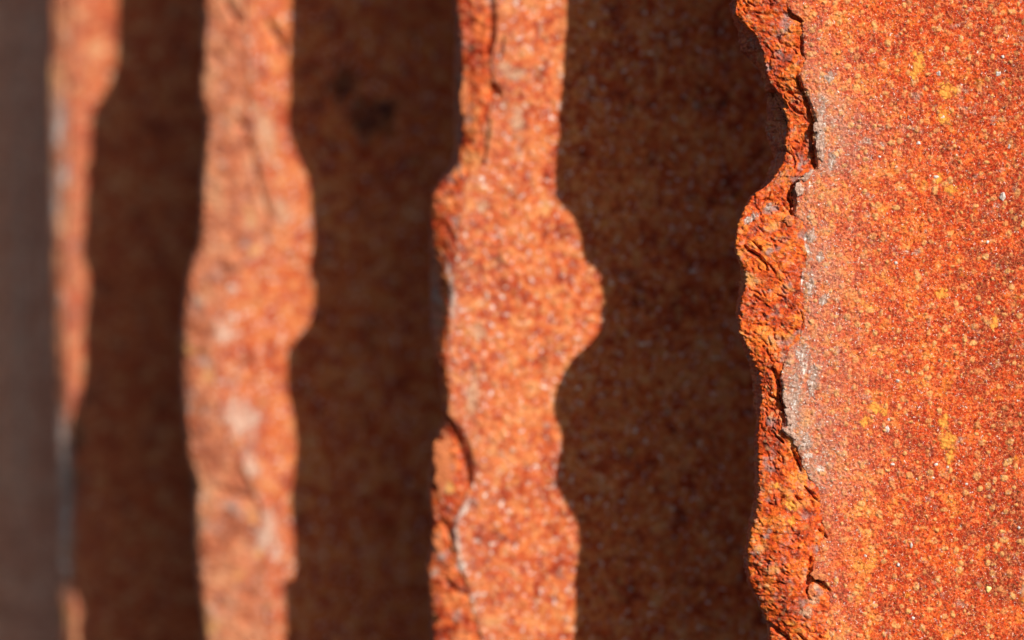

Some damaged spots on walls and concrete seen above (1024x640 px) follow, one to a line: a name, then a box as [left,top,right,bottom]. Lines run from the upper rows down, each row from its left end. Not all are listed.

rust [909,51,925,81]
rust [938,80,957,124]
spalling [729,0,836,640]
rust [860,401,887,428]
rust [938,413,956,465]
rust [774,482,801,526]
rust [800,582,818,617]